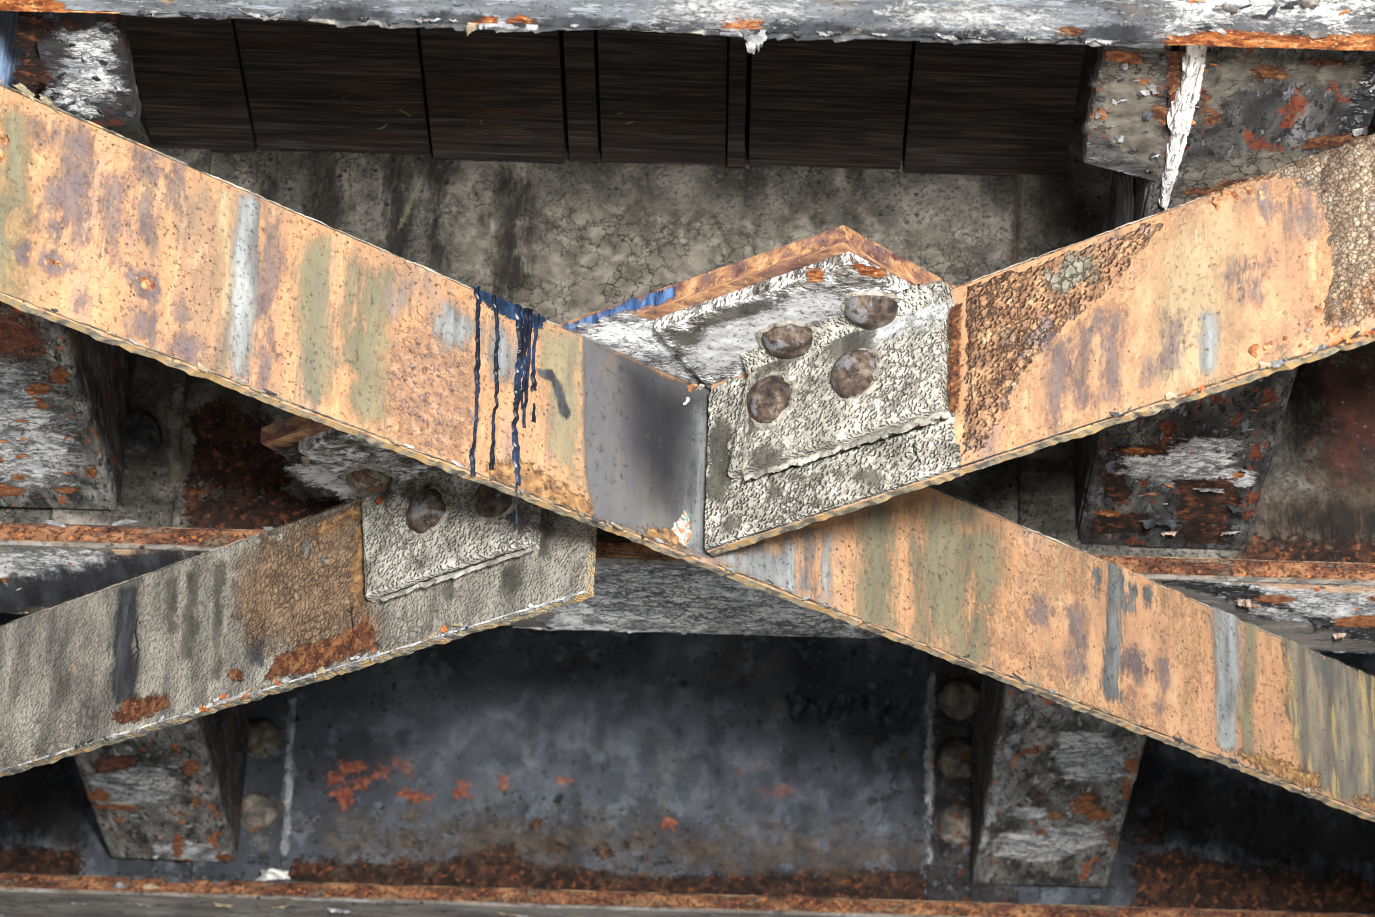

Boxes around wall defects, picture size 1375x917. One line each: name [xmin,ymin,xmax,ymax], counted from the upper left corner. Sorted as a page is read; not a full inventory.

peeling [0,0,1375,207]
rust [16,119,203,364]
rust [374,316,596,516]
rust [947,131,1375,563]
rust [0,842,88,875]
rust [86,755,143,811]
rust [112,690,171,726]
rust [177,391,383,683]
rust [325,755,435,813]
rust [976,543,1218,746]
rust [1129,846,1375,914]
rust [1333,595,1375,629]